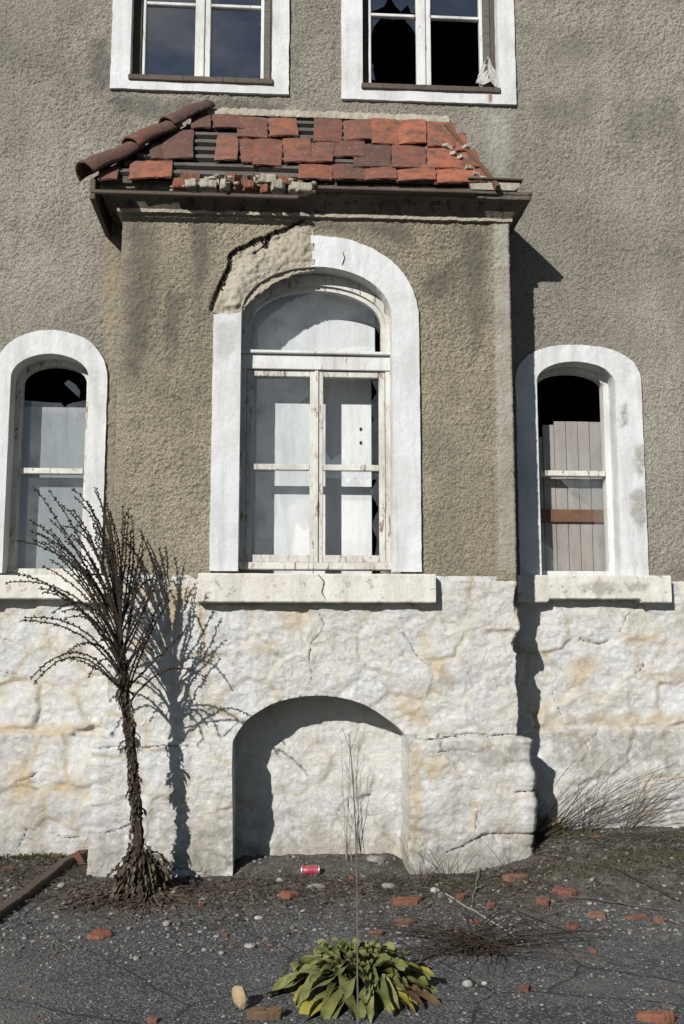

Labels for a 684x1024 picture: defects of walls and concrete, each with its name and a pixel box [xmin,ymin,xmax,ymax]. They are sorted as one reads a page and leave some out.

crack [212,221,304,310]
crack [452,810,522,850]